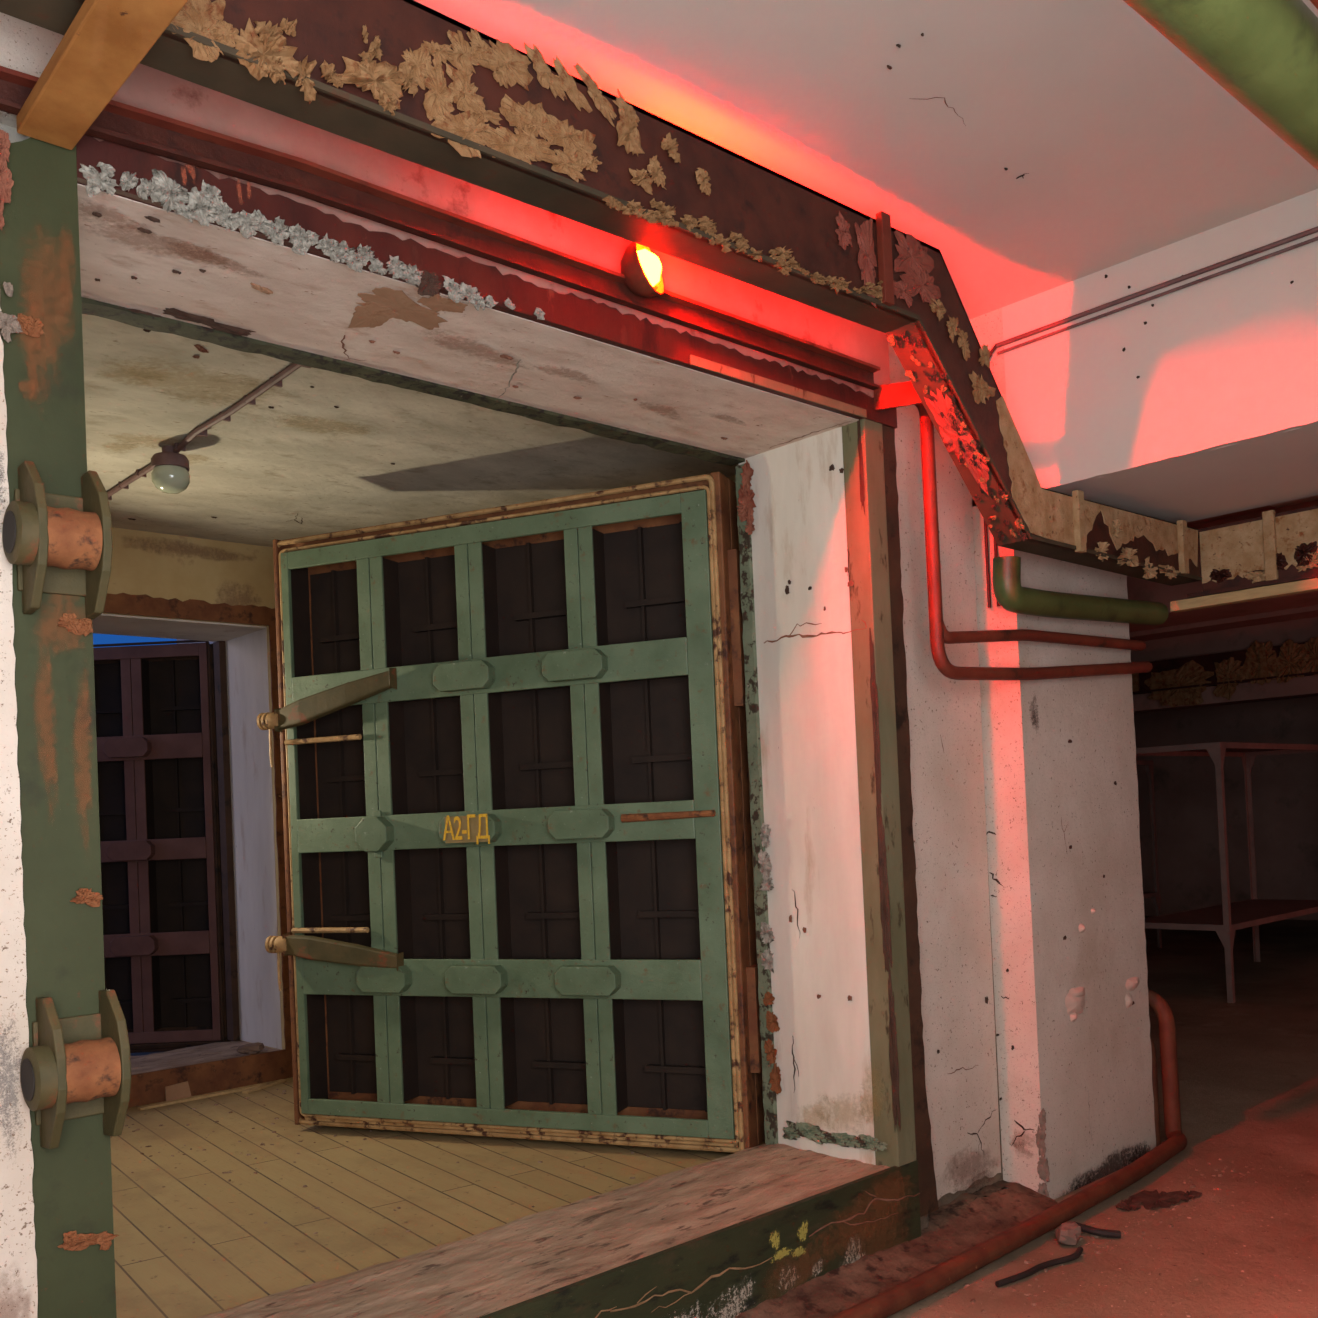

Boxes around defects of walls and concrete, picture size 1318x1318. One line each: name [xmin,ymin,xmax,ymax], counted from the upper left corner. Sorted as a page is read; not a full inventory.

peeling [169,0,996,404]
spalling [79,162,516,343]
corrosion [17,313,44,337]
peeling [736,460,756,535]
peeling [829,420,865,514]
peeling [887,331,1028,541]
peeling [1095,519,1180,579]
corrosion [57,613,93,636]
crack [764,620,867,643]
corrosion [70,888,103,907]
peeling [758,823,774,891]
peeling [869,628,901,1130]